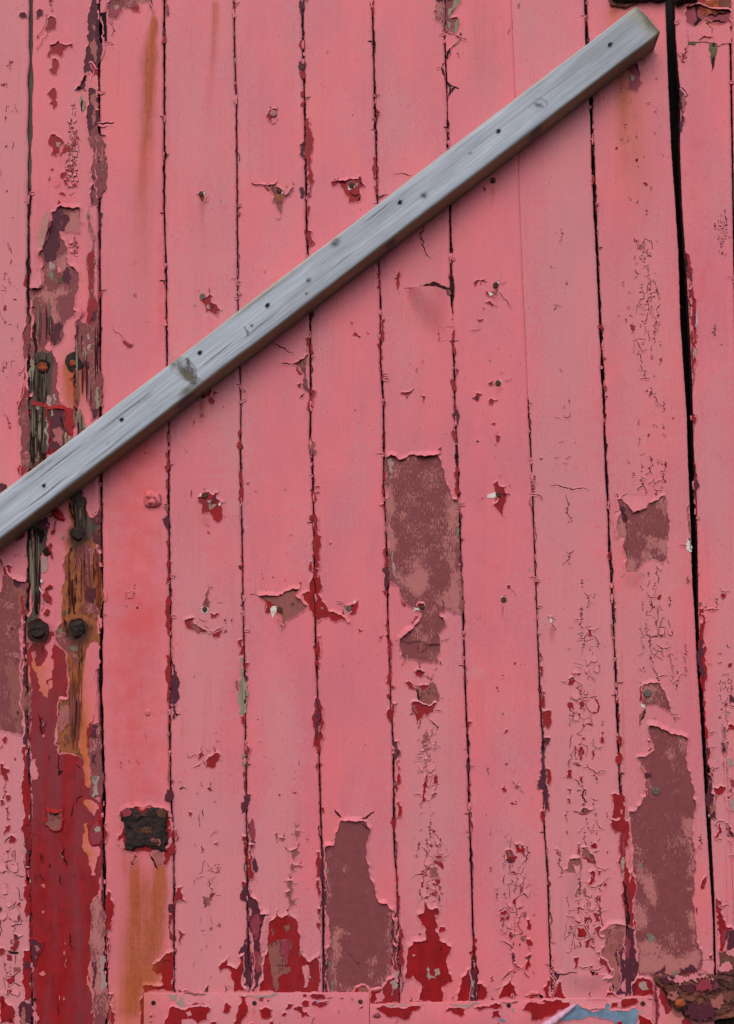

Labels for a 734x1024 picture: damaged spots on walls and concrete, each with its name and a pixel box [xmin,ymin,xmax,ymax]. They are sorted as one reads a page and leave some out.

rust [145,16,156,144]
peeling [15,0,155,478]
crack [621,209,661,377]
rust [65,351,84,407]
rust [27,618,49,646]
peeling [379,450,464,729]
crack [563,550,601,761]
peeling [606,462,700,572]
crack [621,560,688,725]
peeling [0,488,179,1024]
peeling [137,585,734,1024]
crack [393,802,607,952]